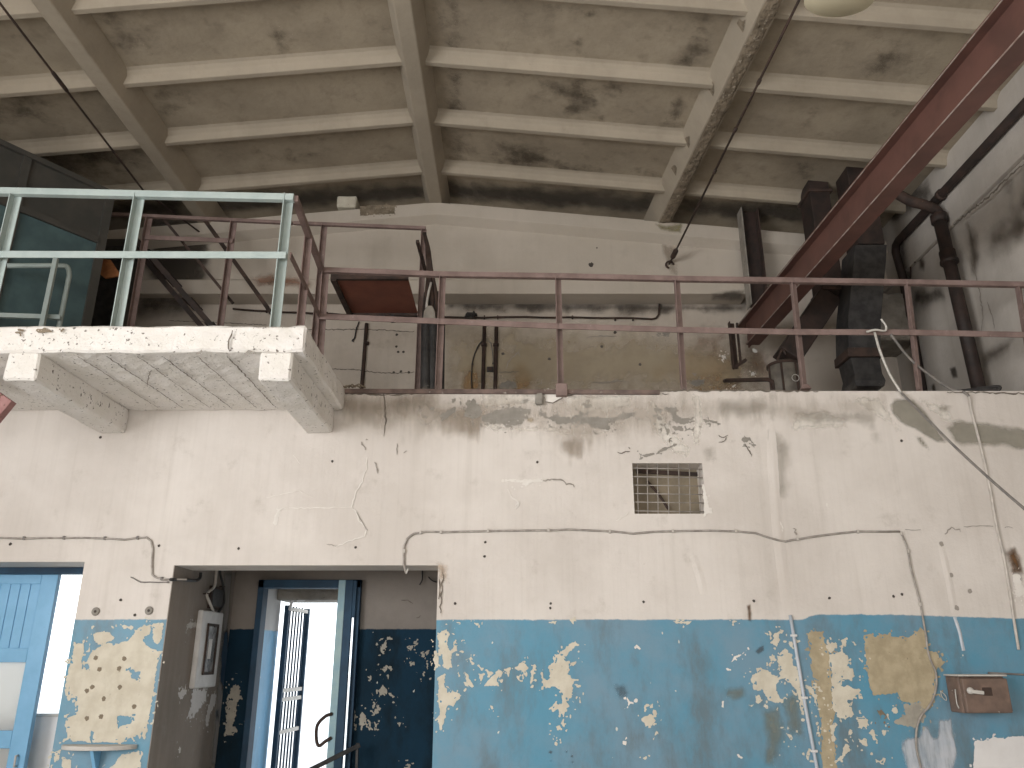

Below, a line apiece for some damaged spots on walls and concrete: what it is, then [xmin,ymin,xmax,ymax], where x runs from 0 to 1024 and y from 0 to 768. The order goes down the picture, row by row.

crack [275,368,413,547]
spalling [418,394,720,460]
damp [459,335,740,455]
damp [857,398,1024,448]
peeling [47,617,165,768]
peeling [354,618,584,746]
peeling [638,701,662,740]
peeling [744,626,898,766]